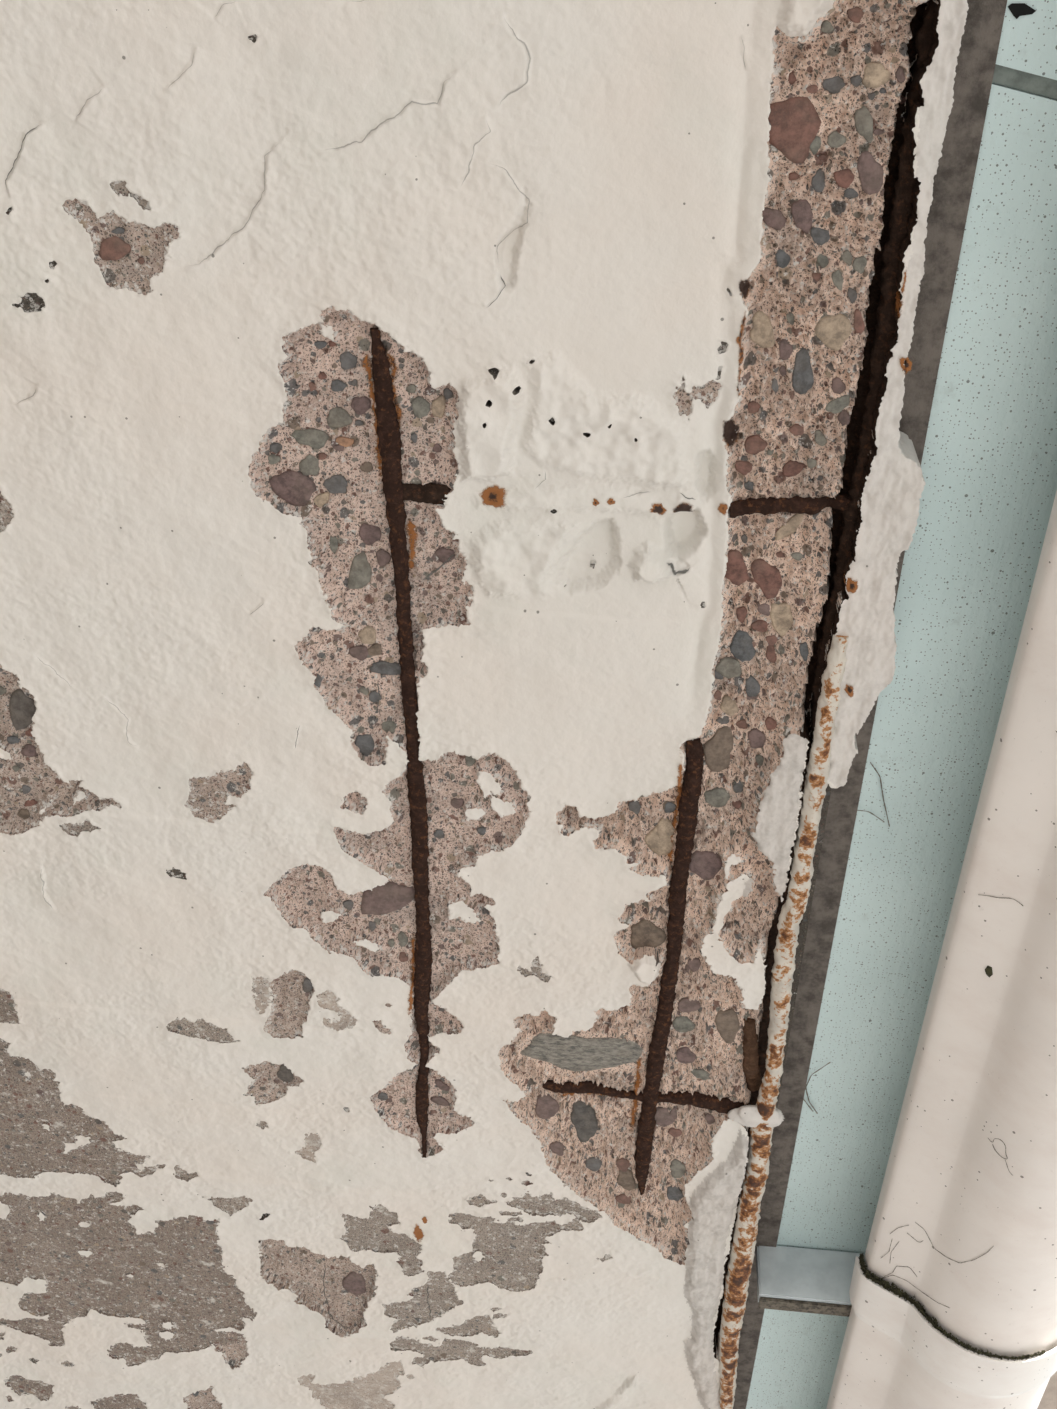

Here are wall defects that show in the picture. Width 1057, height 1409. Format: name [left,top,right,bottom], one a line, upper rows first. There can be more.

peeling [62,180,180,295]
corrosion [739,280,750,299]
corrosion [723,420,740,447]
peeling [0,491,14,532]
corrosion [481,485,505,508]
corrosion [718,495,851,518]
spalling [0,664,122,837]
peeling [184,762,254,823]
corrosion [362,327,451,1158]
spalling [242,0,941,1409]
corrosion [542,738,762,1195]
peeling [0,988,270,1409]